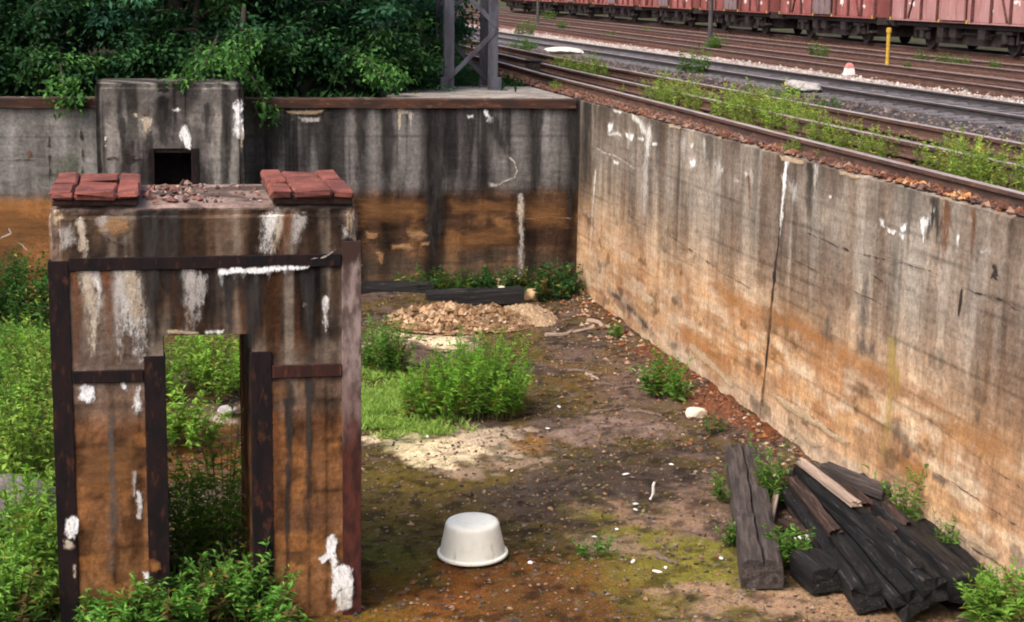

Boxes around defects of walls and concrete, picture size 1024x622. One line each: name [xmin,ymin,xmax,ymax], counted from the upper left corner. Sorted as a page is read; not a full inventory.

efflorescence [75,217,88,258]
water stain [157,108,191,150]
water stain [204,100,244,153]
efflorescence [260,209,305,253]
efflorescence [516,195,524,266]
water stain [608,109,659,216]
water stain [780,156,818,234]
water stain [880,208,935,243]
water stain [72,269,205,351]
water stain [218,251,333,347]
crack [671,217,930,420]
rust [272,410,280,525]